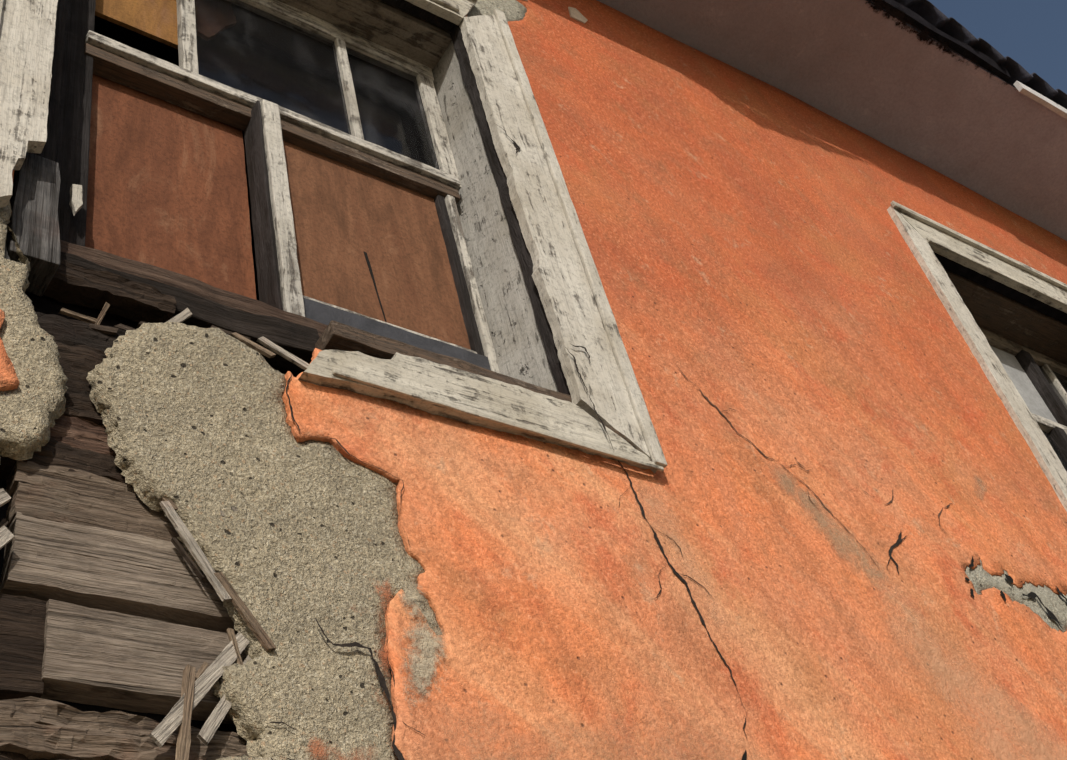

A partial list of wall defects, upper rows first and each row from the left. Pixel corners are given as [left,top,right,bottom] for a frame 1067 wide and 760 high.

peeling [69,184,83,215]
flaking render [0,200,68,461]
flaking render [86,321,445,760]
crack [315,618,426,760]
crack [565,344,747,760]
crack [677,366,906,574]
crack [965,556,1067,629]
flaking render [965,560,1067,633]